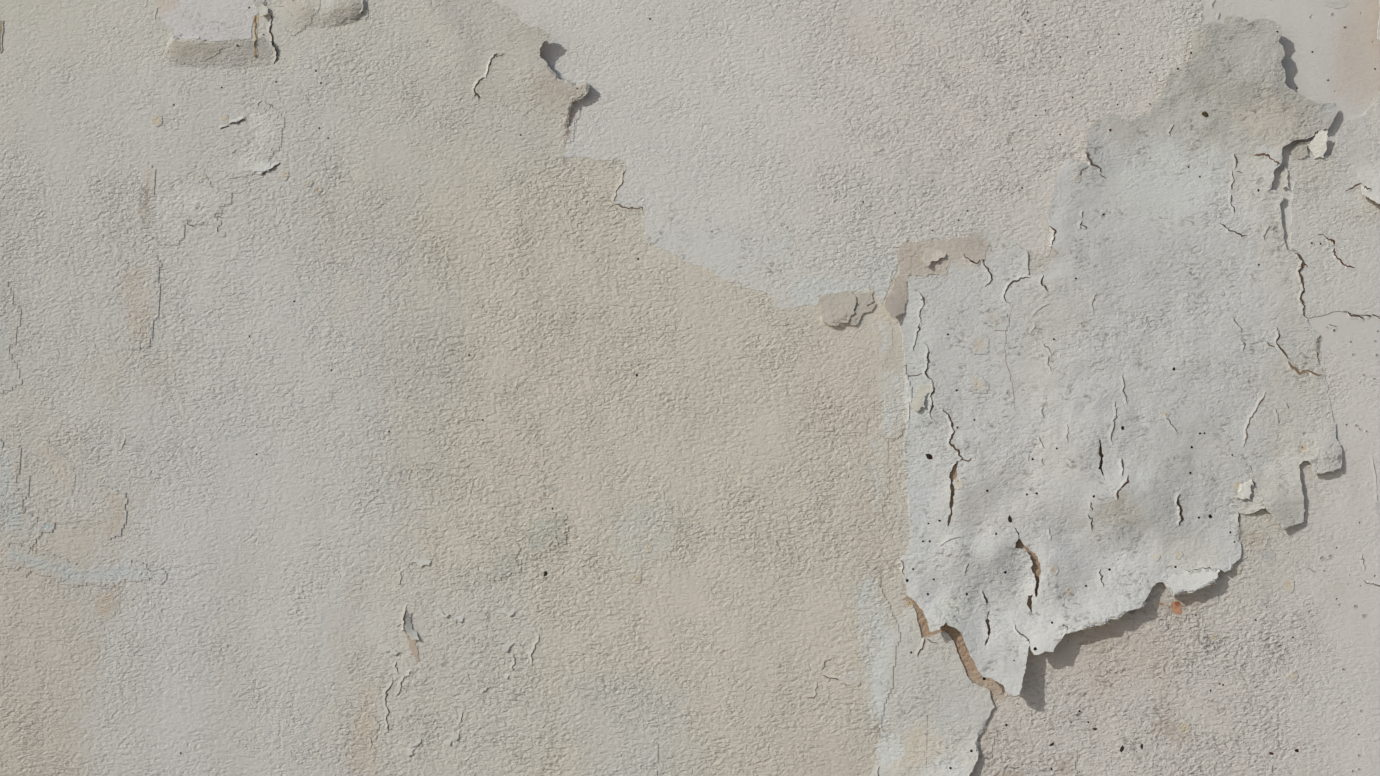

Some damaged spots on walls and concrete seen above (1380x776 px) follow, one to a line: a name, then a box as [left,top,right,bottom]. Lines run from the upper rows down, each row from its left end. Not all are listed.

peeling [154,0,279,69]
crack [1079,152,1106,178]
peeling [1356,91,1380,204]
peeling [475,0,1368,776]
crack [908,292,971,462]
crack [961,210,1087,466]
crack [1086,375,1129,532]
crack [1219,153,1380,526]
crack [1096,569,1104,587]
crack [368,571,447,748]
crack [457,634,540,725]